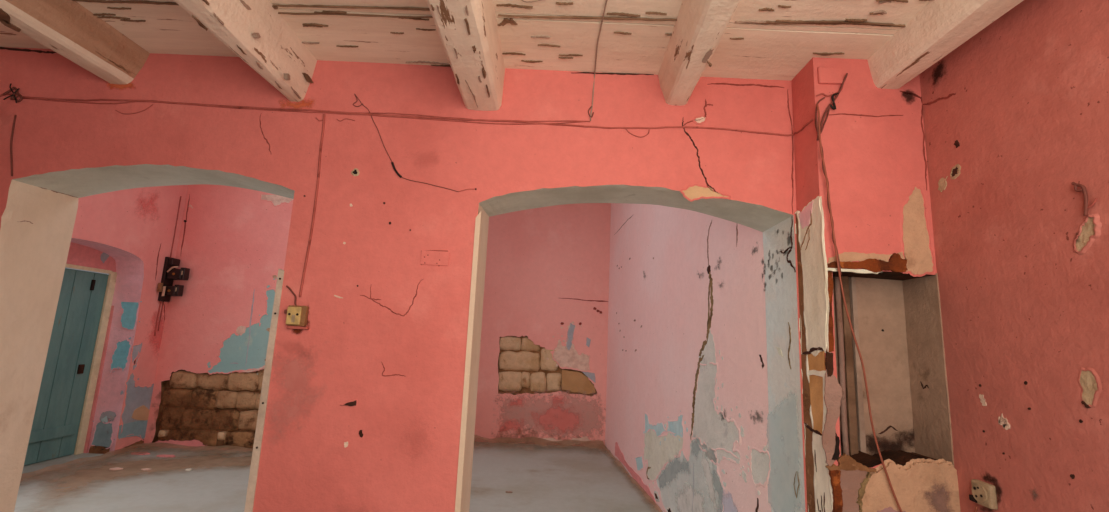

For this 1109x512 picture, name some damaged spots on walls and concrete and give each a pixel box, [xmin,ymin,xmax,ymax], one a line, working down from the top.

peeling [89,296,154,454]
peeling [207,274,277,375]
crack [360,250,448,316]
peeling [547,322,596,383]
peeling [615,329,772,512]
flaking render [680,184,731,202]
crack [690,221,738,439]
crack [682,83,796,272]
crack [759,322,791,369]
flaking render [795,185,977,512]
flaking render [1073,213,1102,255]
flaking render [1077,367,1102,423]